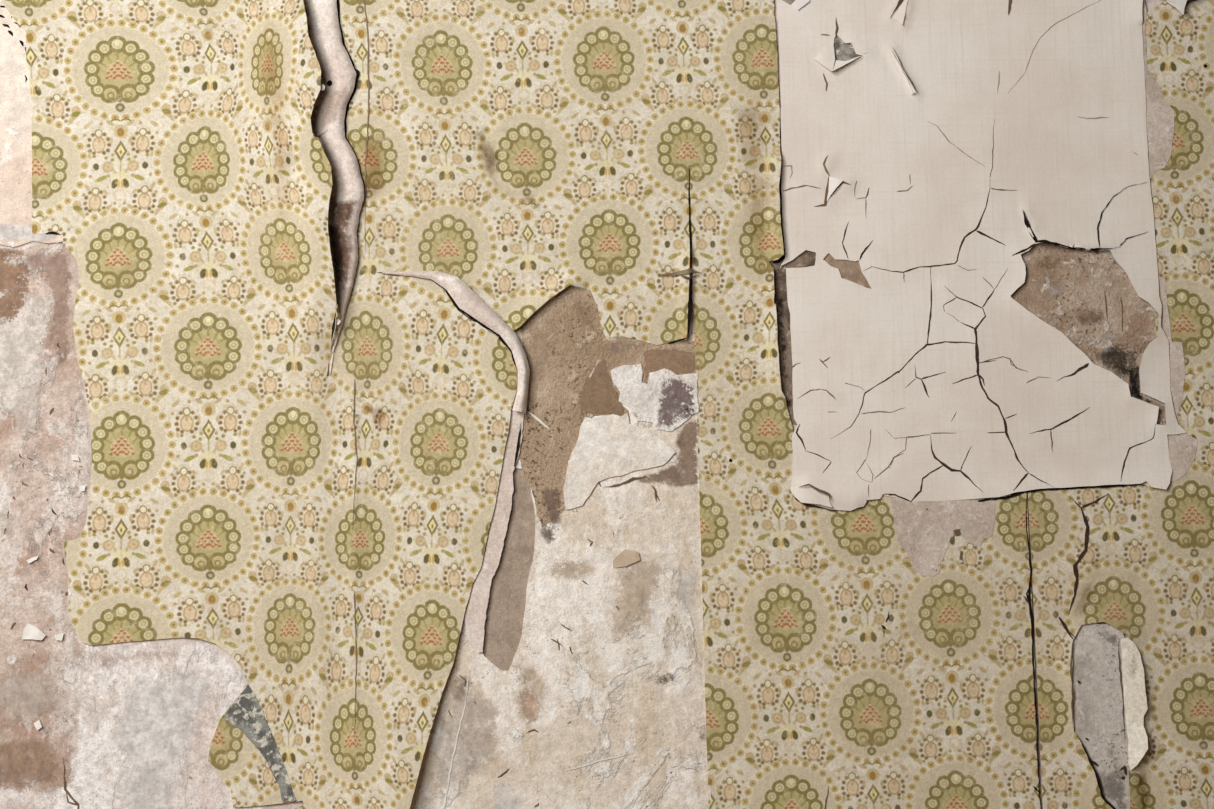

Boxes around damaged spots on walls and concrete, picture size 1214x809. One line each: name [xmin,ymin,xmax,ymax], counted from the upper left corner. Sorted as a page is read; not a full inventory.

crack [997,0,1100,93]
peeling [1166,0,1196,17]
flaking render [0,0,274,809]
flaking render [410,285,711,809]
crack [669,172,693,344]
crack [773,102,818,263]
crack [793,123,1156,809]
flaking render [1011,243,1166,425]
flaking render [1059,618,1148,809]